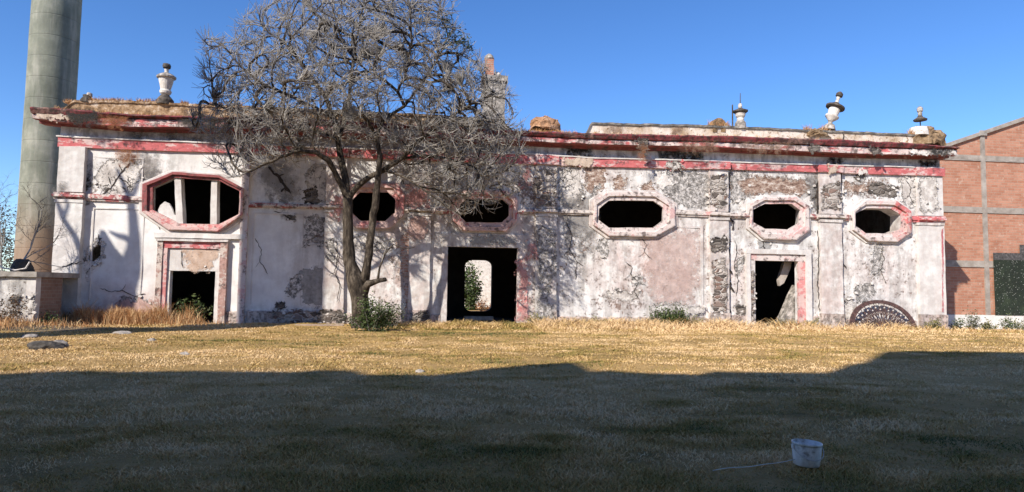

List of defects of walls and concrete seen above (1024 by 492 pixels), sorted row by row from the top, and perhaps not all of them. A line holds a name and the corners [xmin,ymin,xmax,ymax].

peeling [36,113,72,123]
flaking render [285,163,343,249]
flaking render [518,143,941,214]
peeling [180,248,220,273]
flaking render [266,263,347,324]
peeling [606,228,757,321]